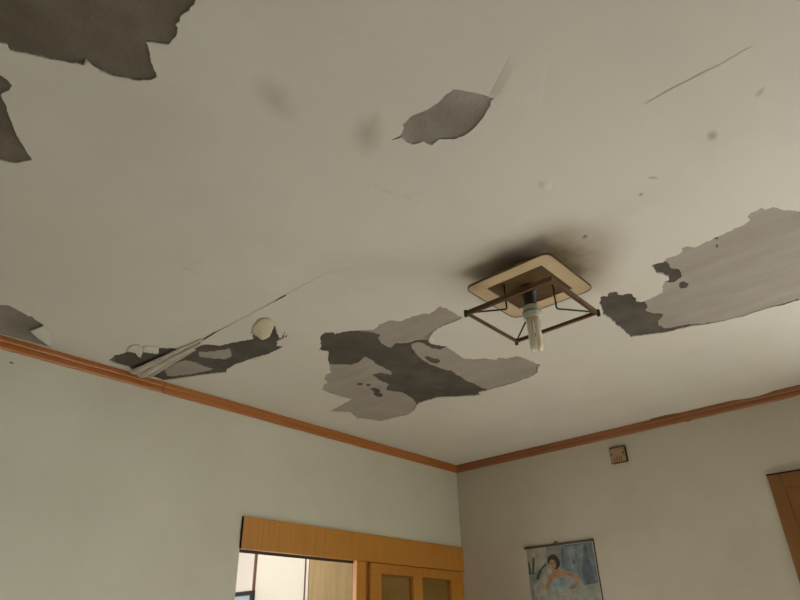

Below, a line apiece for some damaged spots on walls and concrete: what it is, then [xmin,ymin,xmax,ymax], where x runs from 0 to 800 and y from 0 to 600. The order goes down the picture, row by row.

peeling [0,0,195,80]
crack [647,47,751,103]
peeling [0,75,31,162]
peeling [401,89,493,145]
peeling [599,207,800,336]
peeling [0,305,52,347]
peeling [110,318,285,380]
crack [197,276,321,344]
peeling [319,306,540,421]